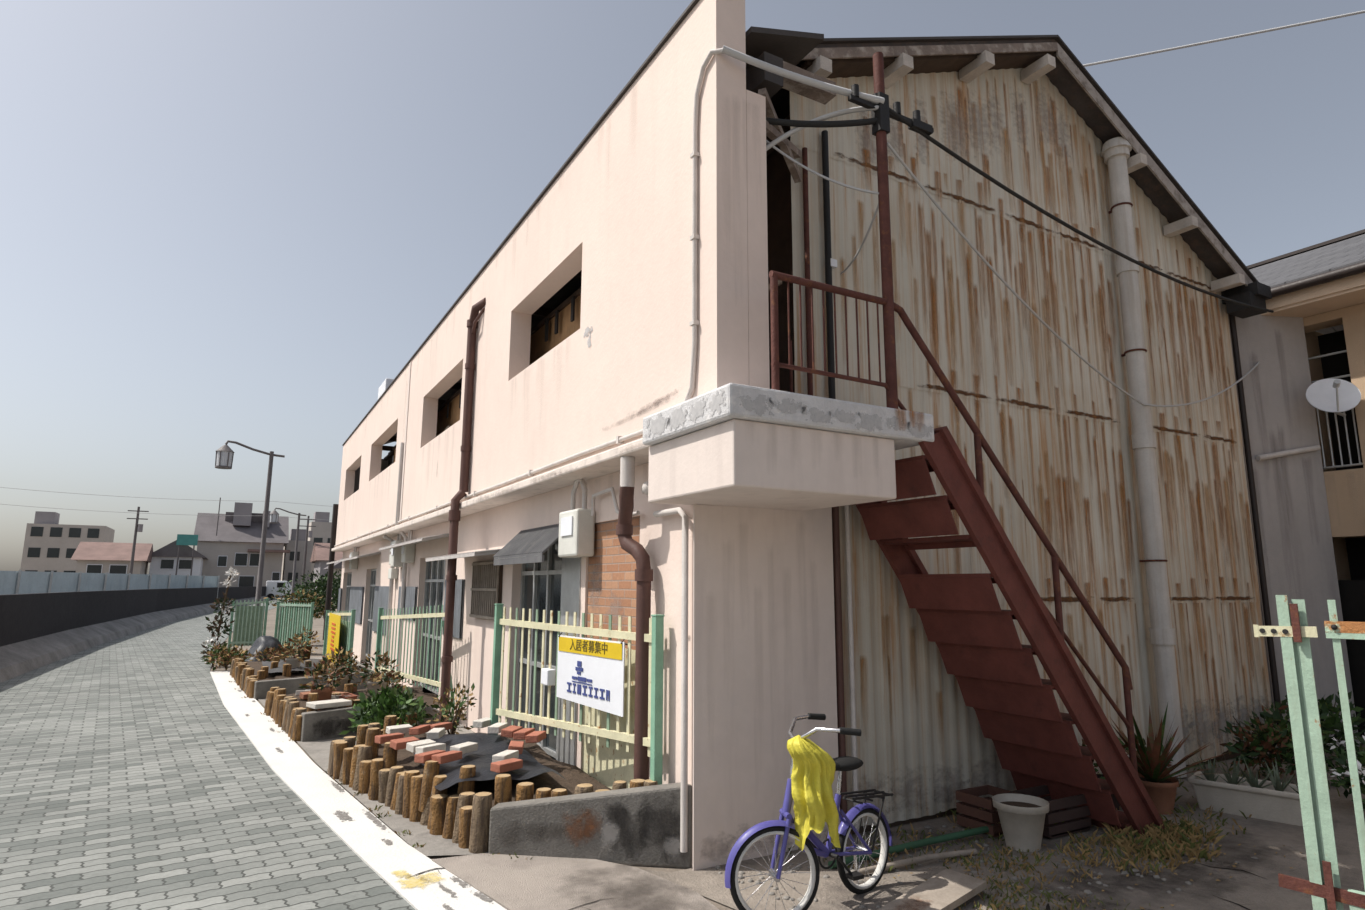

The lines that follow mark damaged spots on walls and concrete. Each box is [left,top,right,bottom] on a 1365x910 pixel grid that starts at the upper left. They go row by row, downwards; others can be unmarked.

rust [837,82,1114,377]
rust [927,361,1058,462]
rust [1039,395,1132,553]
rust [1041,578,1136,630]
leakage [603,806,680,862]